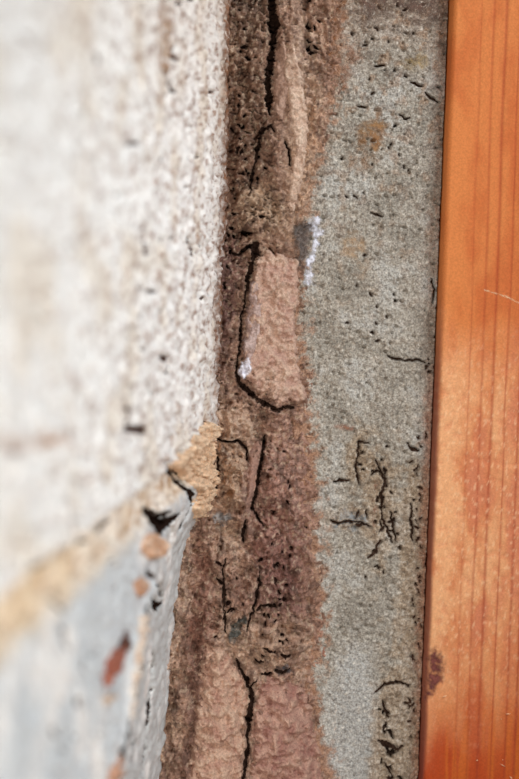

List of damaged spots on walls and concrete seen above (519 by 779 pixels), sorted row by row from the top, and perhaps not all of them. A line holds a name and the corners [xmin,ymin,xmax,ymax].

crack [249,0,290,194]
crack [229,230,294,413]
spalling [132,570,154,598]
spalling [140,507,181,559]
crack [166,467,195,529]
crack [216,559,262,634]
crack [215,435,266,542]
crack [330,440,396,558]
peeling [107,754,131,779]
peeling [99,614,151,719]
crack [236,658,258,779]
crack [375,680,408,718]